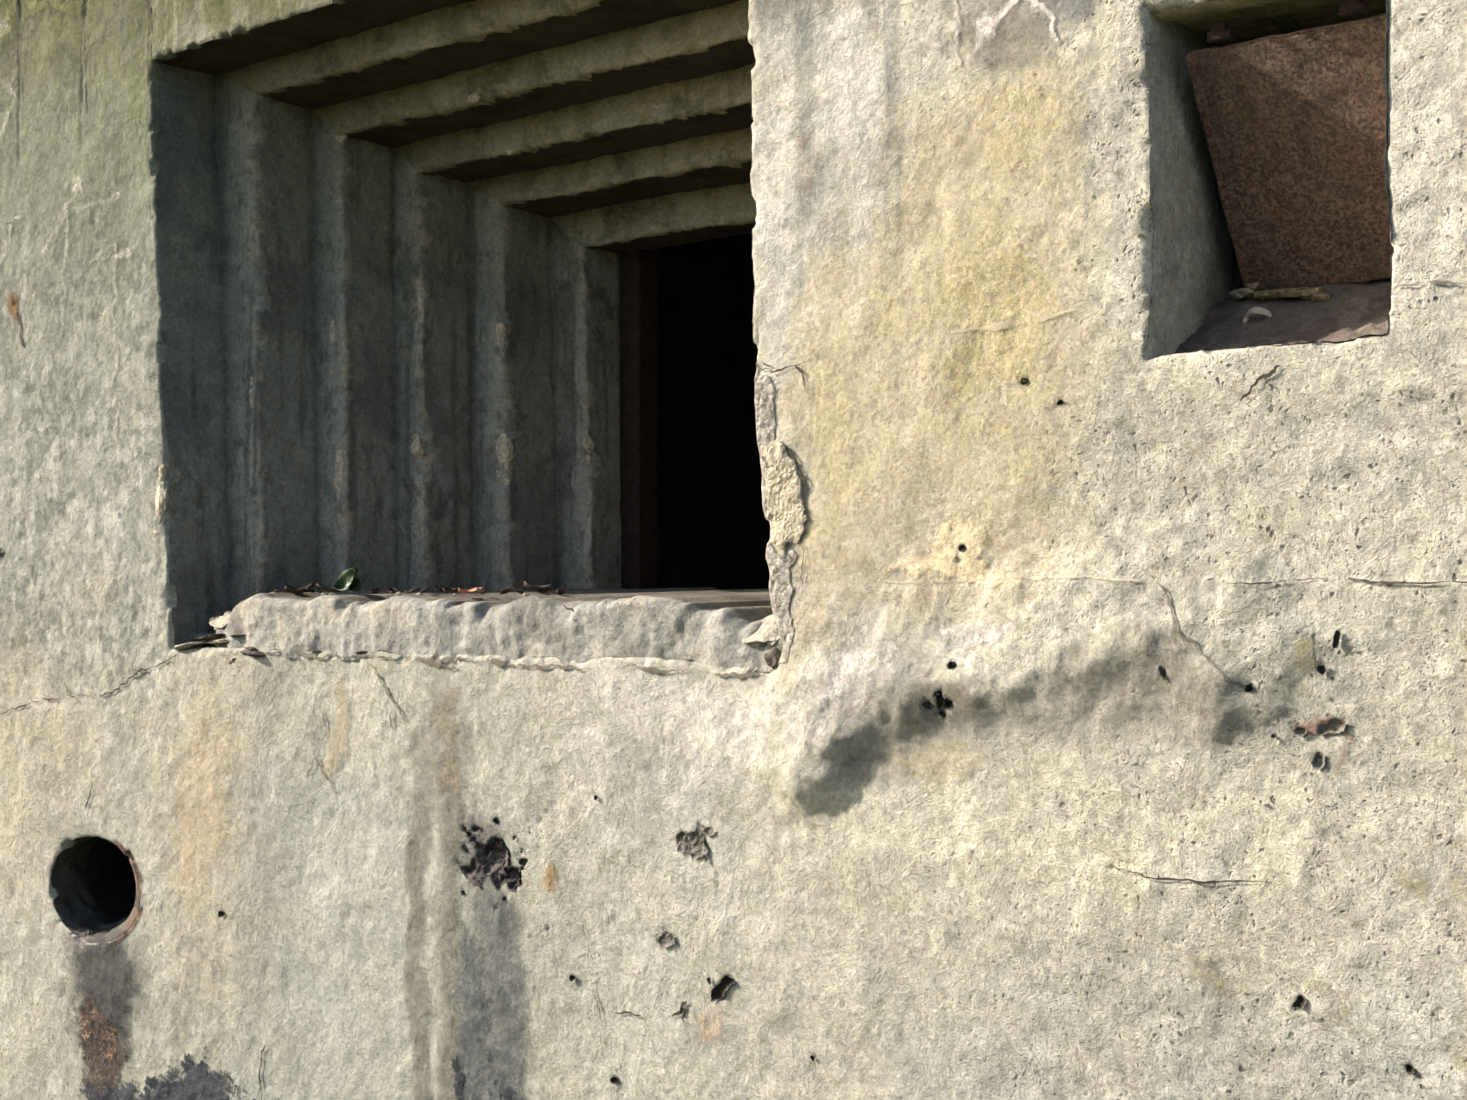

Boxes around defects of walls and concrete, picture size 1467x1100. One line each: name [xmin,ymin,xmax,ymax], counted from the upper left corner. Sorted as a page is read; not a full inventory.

water stain [918,0,1090,66]
rust [7,291,24,347]
spalling [754,365,807,663]
peeling [949,517,986,563]
crack [1157,578,1247,688]
crack [0,648,188,714]
spalling [922,690,954,718]
spalling [455,812,531,901]
spalling [676,822,714,863]
water stain [403,697,531,1100]
spalling [707,970,735,1002]
rust [64,994,129,1099]